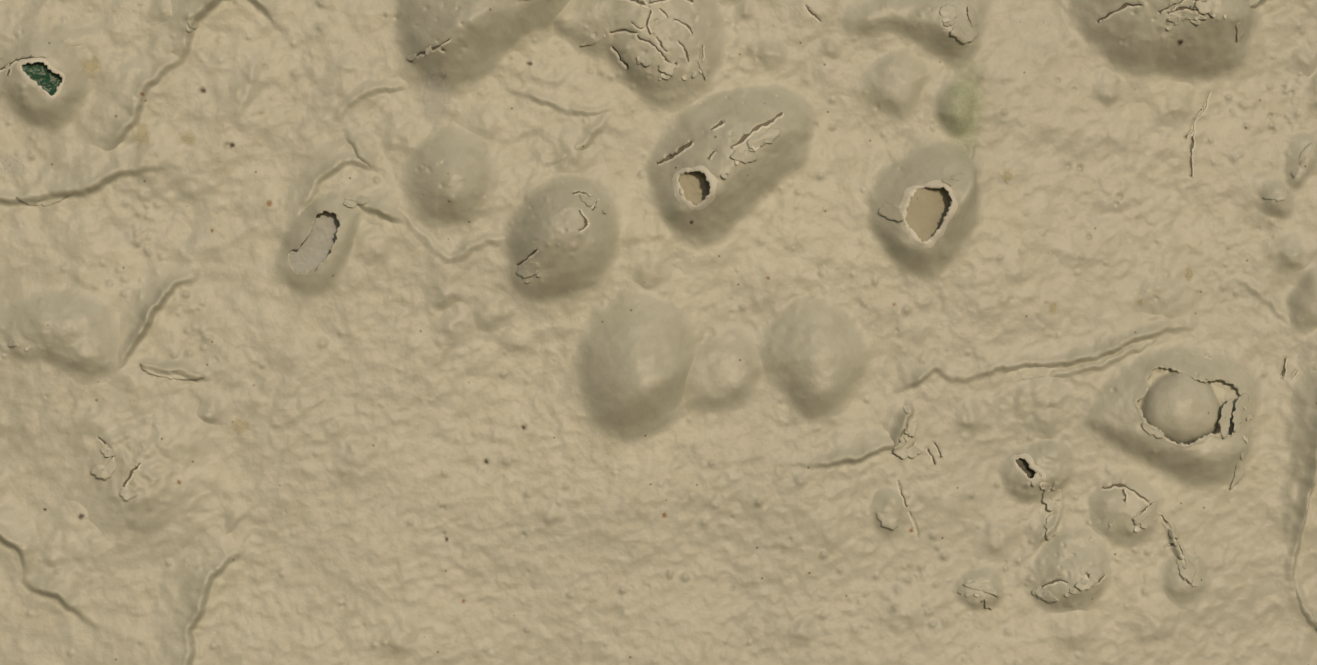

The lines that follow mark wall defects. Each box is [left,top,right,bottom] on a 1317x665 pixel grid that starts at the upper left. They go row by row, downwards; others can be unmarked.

crack [609,0,707,81]
crack [1095,0,1214,23]
peeling [0,0,307,221]
peeling [277,66,409,236]
crack [656,110,784,166]
peeling [789,310,1203,482]
peeling [1157,506,1196,584]